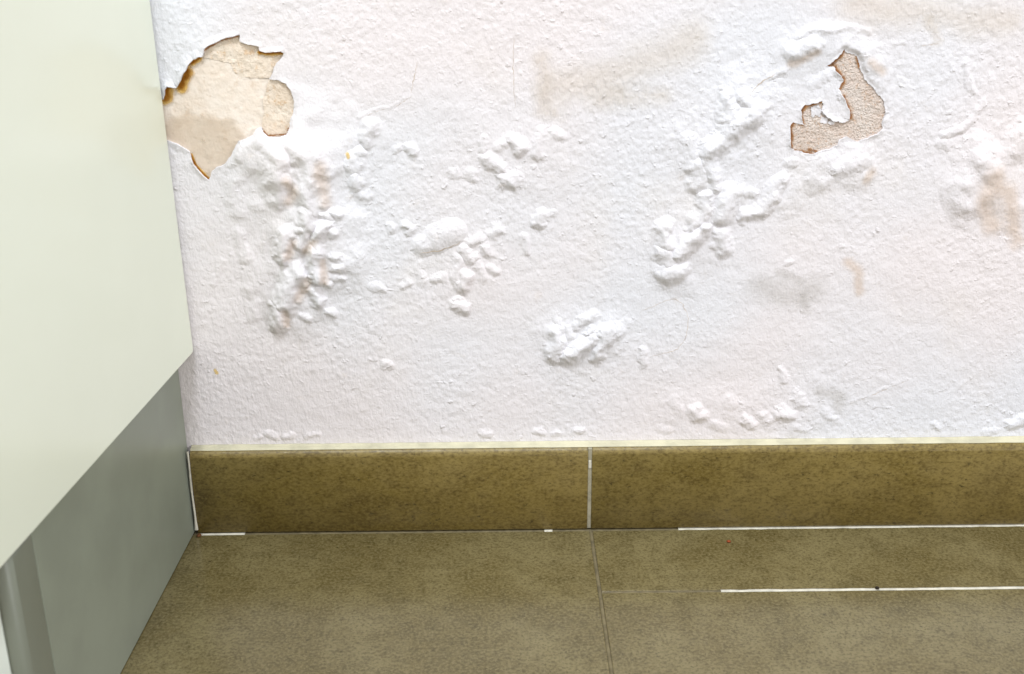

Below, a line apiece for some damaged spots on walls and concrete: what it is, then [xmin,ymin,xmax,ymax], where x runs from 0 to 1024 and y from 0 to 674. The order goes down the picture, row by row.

peeling [160,28,300,185]
peeling [785,48,894,160]